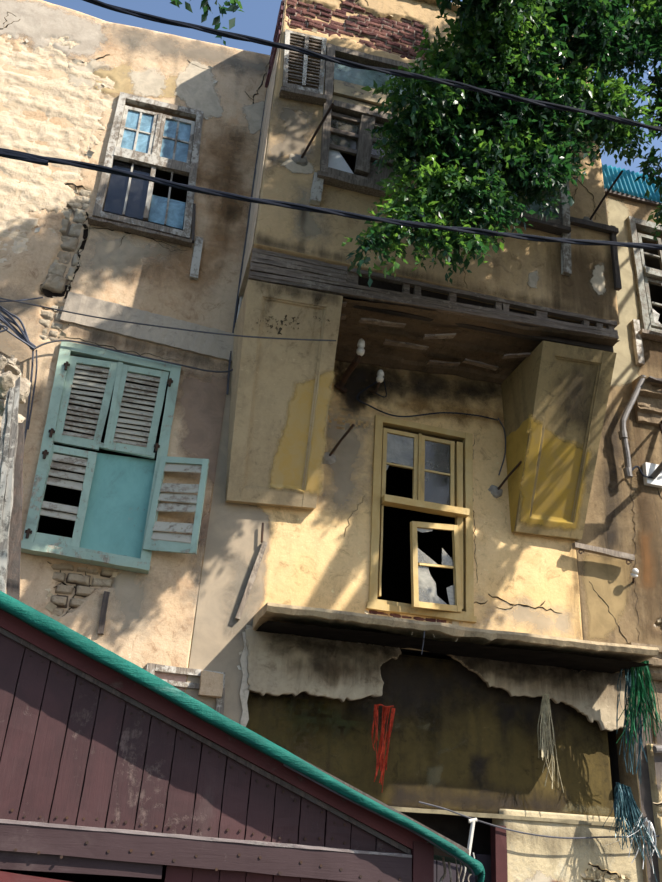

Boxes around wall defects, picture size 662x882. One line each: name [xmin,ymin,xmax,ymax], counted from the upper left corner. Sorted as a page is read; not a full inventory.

peeling [159,61,224,120]
spalling [283,0,434,61]
peeling [0,34,135,364]
peeling [590,199,641,386]
peeling [270,371,367,509]
spalling [45,563,118,621]
crack [344,494,367,537]
crack [473,488,562,613]
crack [589,478,640,643]
flaking render [634,703,660,882]
spalling [581,867,627,882]